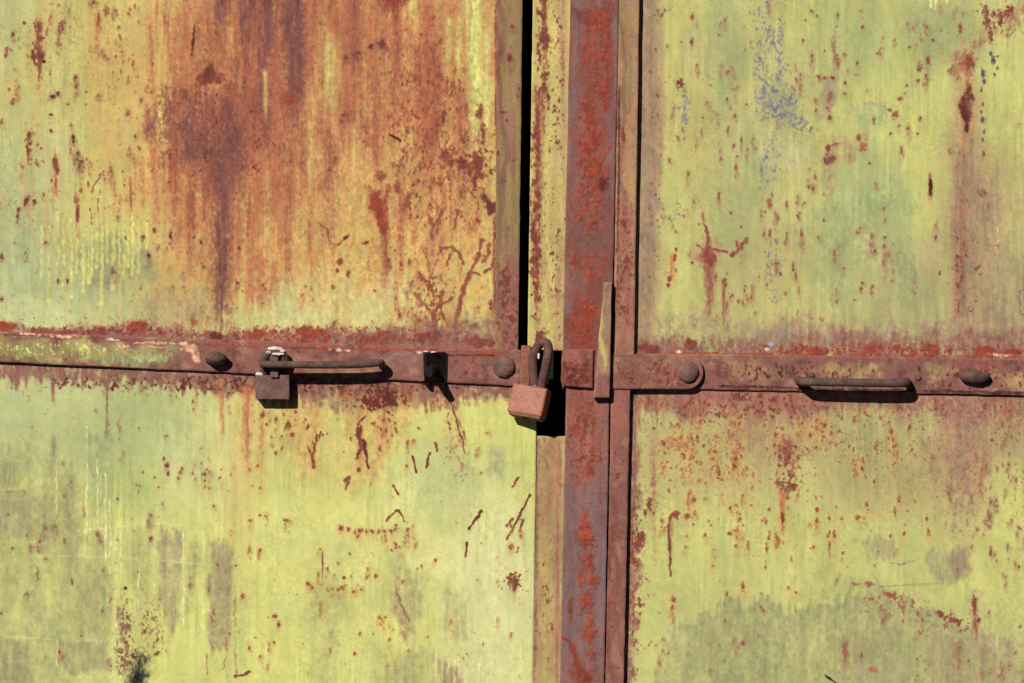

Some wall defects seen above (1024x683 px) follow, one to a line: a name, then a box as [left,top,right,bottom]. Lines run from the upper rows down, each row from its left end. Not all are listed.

corrosion [0,0,522,621]
corrosion [493,0,1024,683]
corrosion [205,584,234,658]
corrosion [245,610,284,676]
corrosion [339,602,406,661]